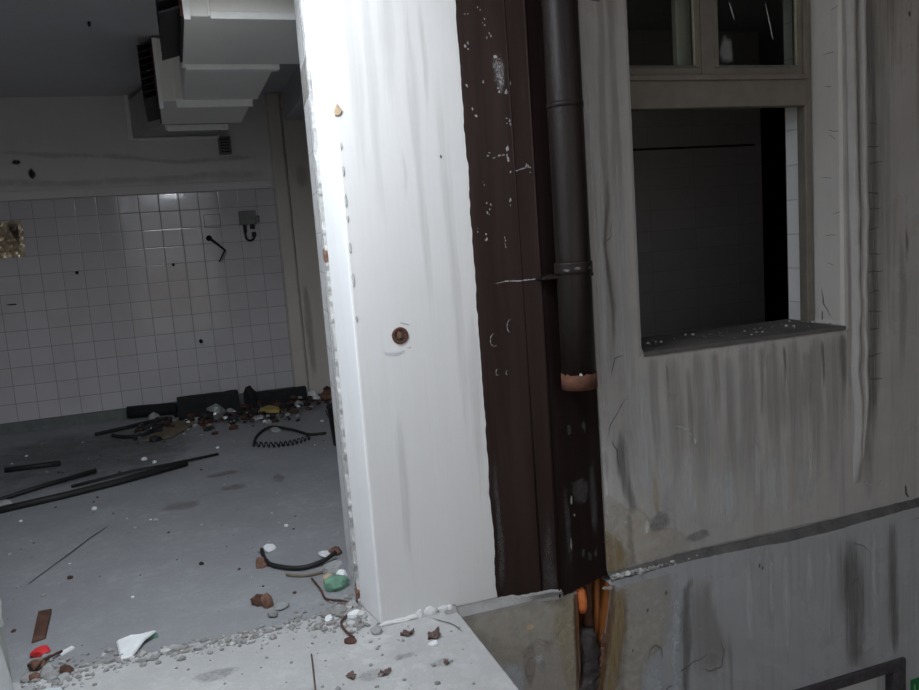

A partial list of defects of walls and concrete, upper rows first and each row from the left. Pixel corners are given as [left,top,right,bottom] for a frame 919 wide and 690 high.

water stain [860,0,876,399]
rust [392,327,408,344]
water stain [570,445,678,573]